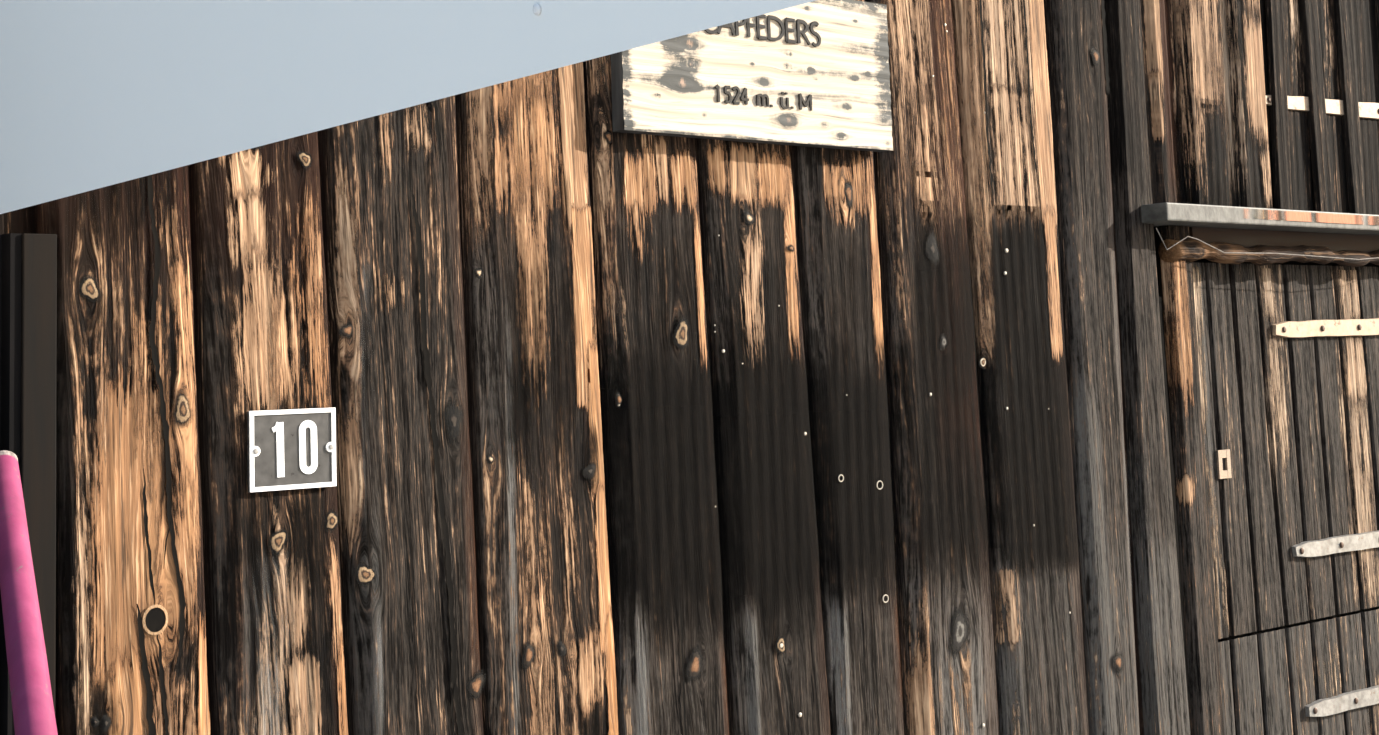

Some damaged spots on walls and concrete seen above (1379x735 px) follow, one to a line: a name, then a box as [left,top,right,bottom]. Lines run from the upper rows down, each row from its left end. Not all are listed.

corrosion [1246,209,1379,225]